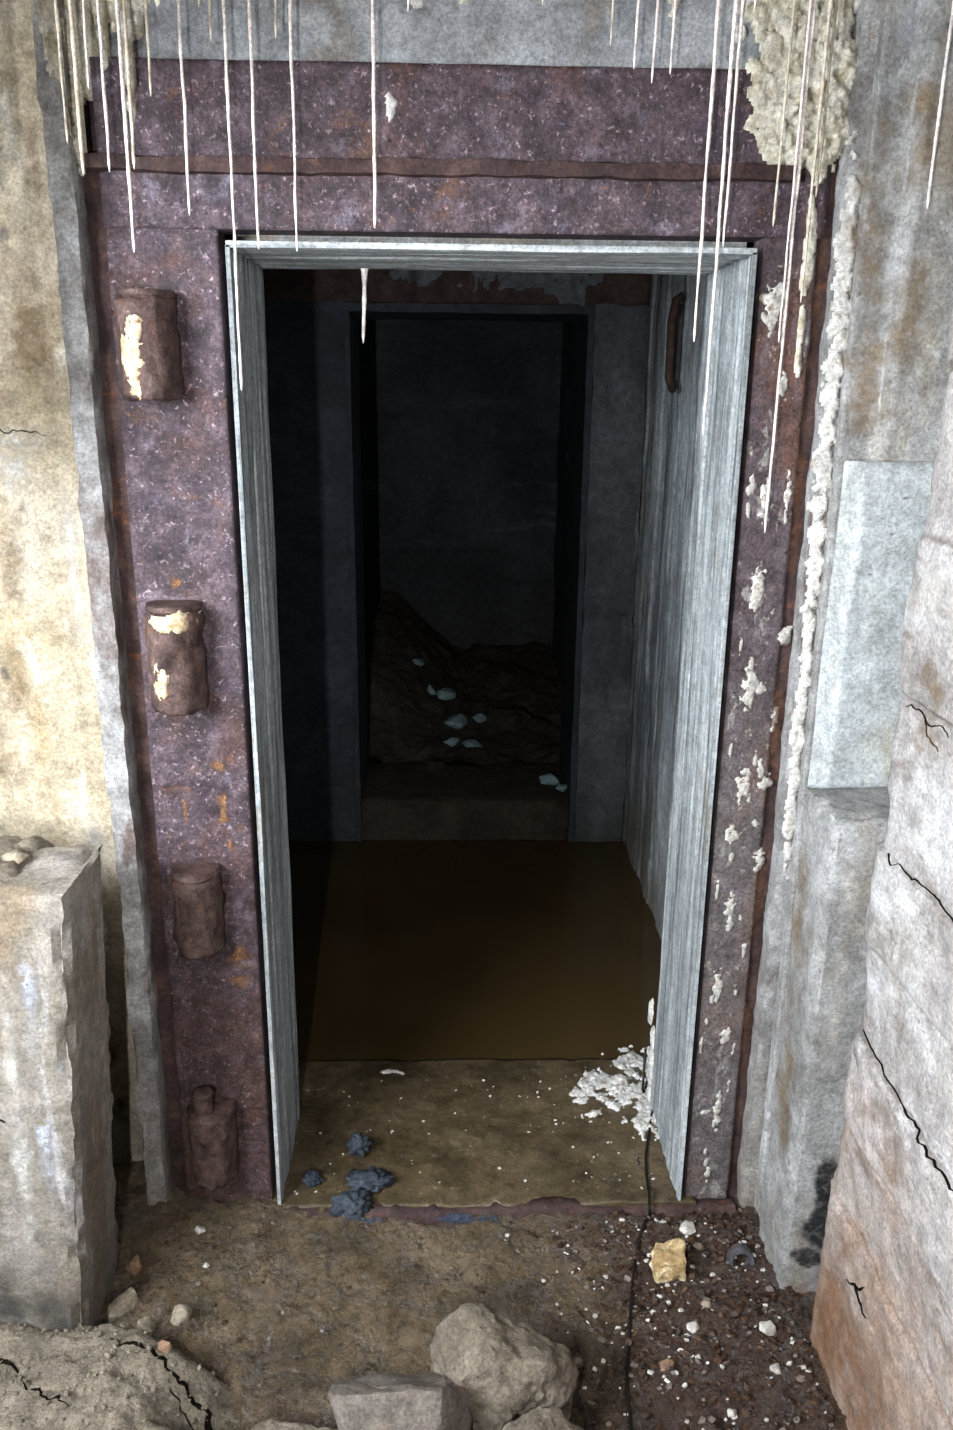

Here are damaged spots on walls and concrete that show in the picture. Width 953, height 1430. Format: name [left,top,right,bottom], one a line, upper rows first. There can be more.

water stain [34,0,160,176]
water stain [384,92,397,122]
peeling [390,269,443,287]
peeling [457,271,604,306]
water stain [13,309,44,378]
water stain [731,0,879,947]
corrosion [218,794,228,822]
crack [887,853,953,922]
water stain [565,998,660,1141]
crack [863,1030,953,1191]
water stain [790,1160,837,1268]